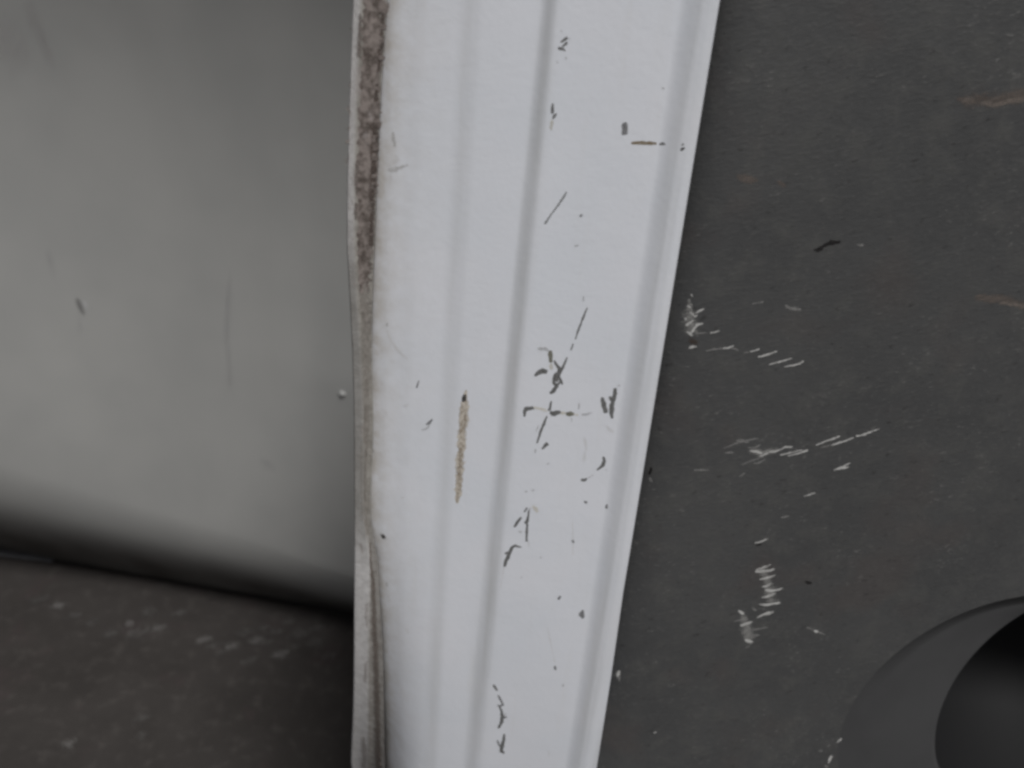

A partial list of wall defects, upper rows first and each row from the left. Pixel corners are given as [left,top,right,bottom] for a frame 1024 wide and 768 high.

peeling [523,347,621,422]